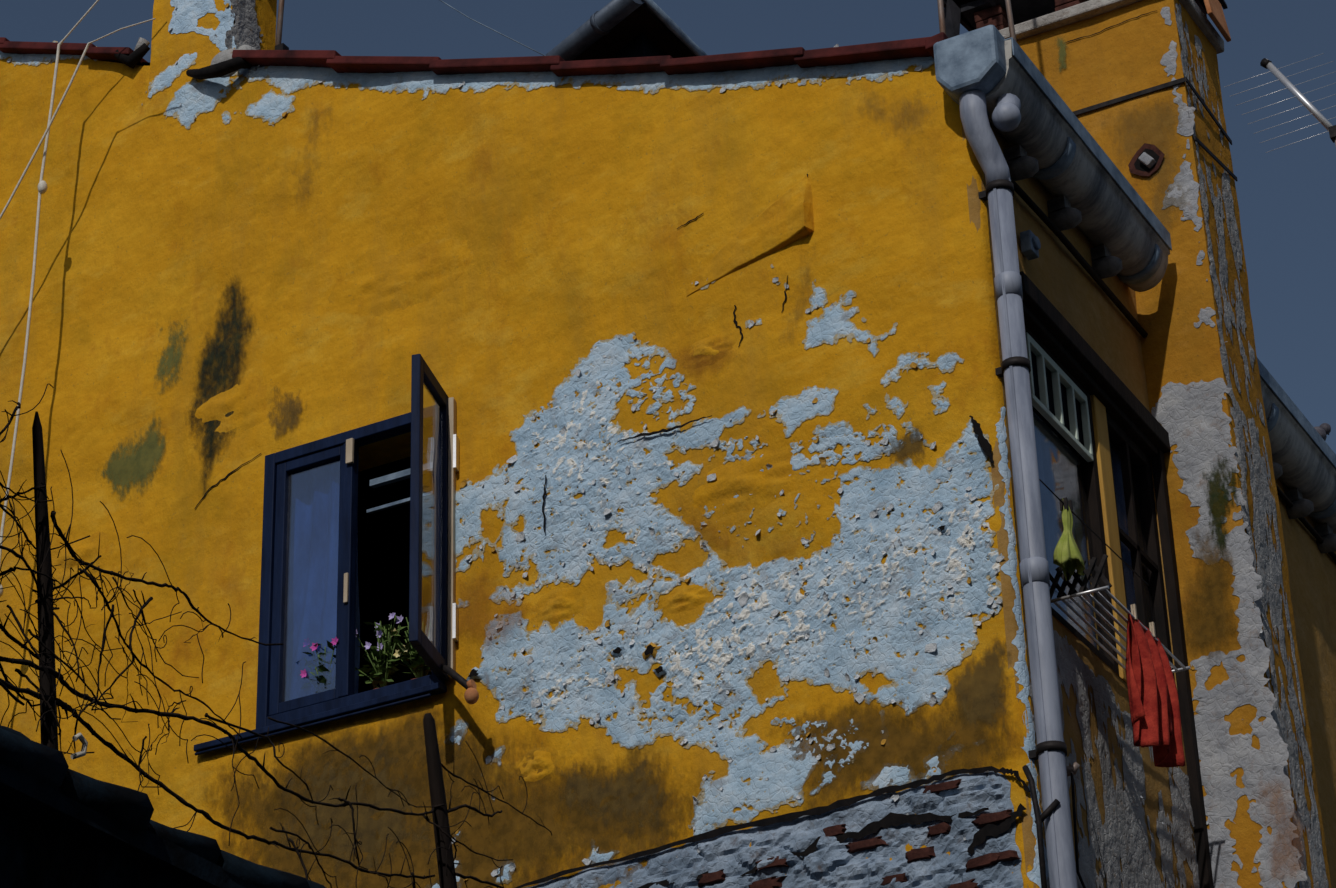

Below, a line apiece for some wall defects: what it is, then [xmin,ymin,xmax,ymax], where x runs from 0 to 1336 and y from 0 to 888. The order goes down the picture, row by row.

peeling [142,0,935,129]
peeling [745,318,762,328]
peeling [802,279,898,357]
damp [269,394,302,435]
peeling [1053,1,1328,888]
peeling [455,332,1050,888]
peeling [444,719,469,745]